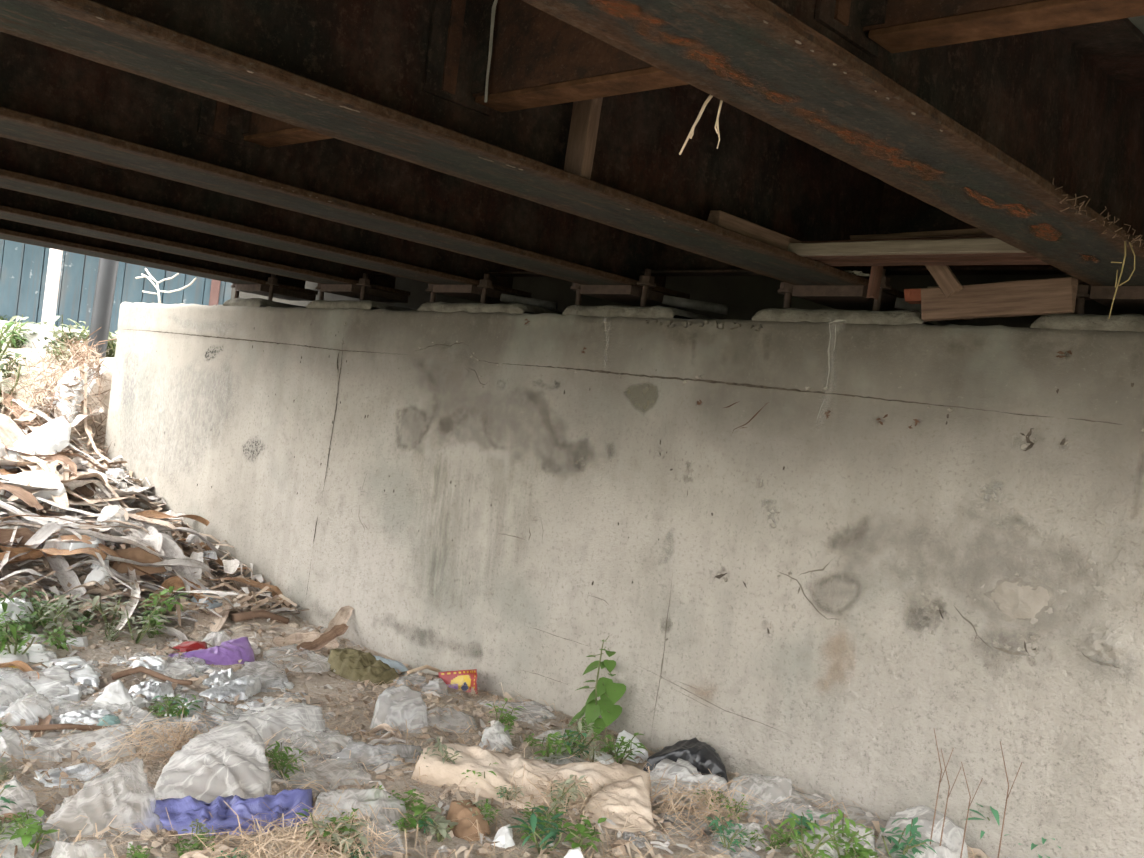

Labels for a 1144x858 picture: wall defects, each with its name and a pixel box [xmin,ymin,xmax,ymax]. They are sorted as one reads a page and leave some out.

corrosion [595,0,945,181]
corrosion [962,187,1061,241]
damp [625,384,658,412]
crack [125,323,1144,602]
crack [776,562,833,619]
crack [953,605,992,649]